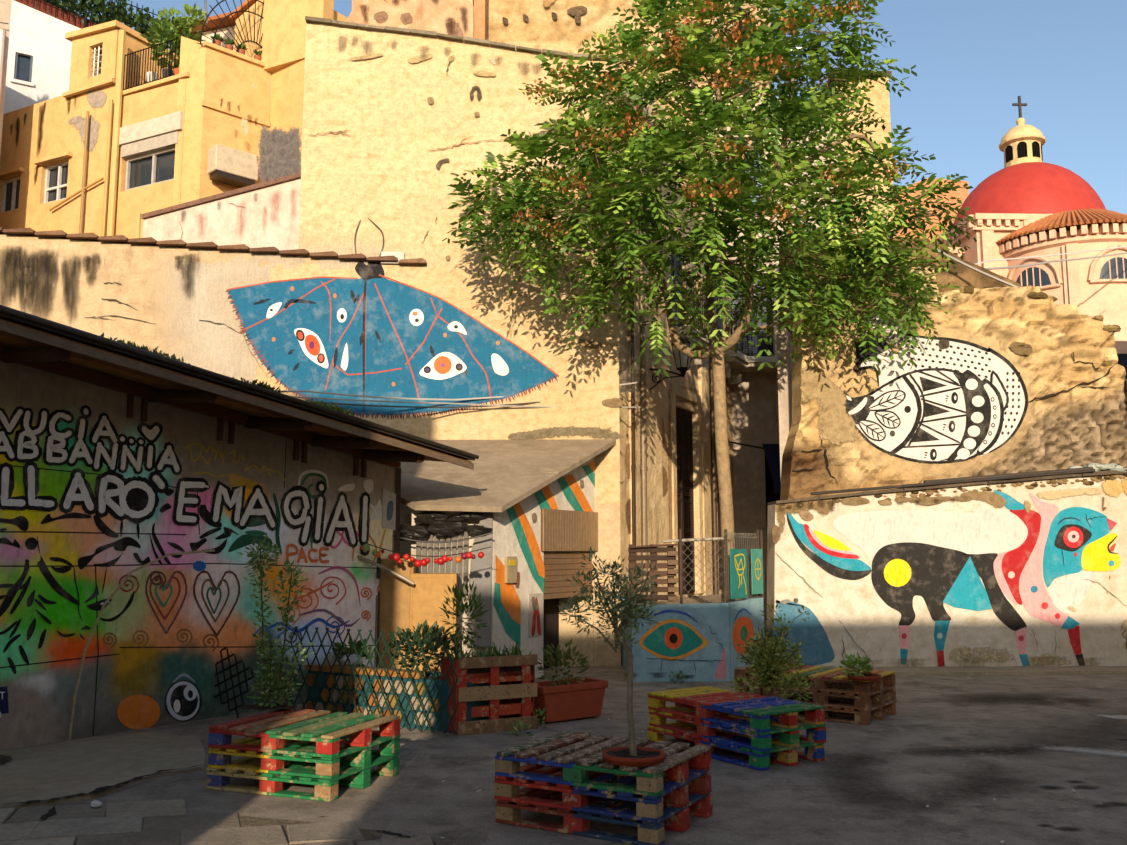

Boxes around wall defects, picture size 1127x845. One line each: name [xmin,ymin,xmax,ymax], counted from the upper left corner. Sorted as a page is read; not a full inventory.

spalling [374,11,412,24]
damp [38,103,46,152]
spalling [68,90,107,152]
spalling [241,118,302,182]
damp [0,249,97,315]
damp [177,256,195,291]
crack [1027,352,1127,404]
spalling [772,474,1127,544]